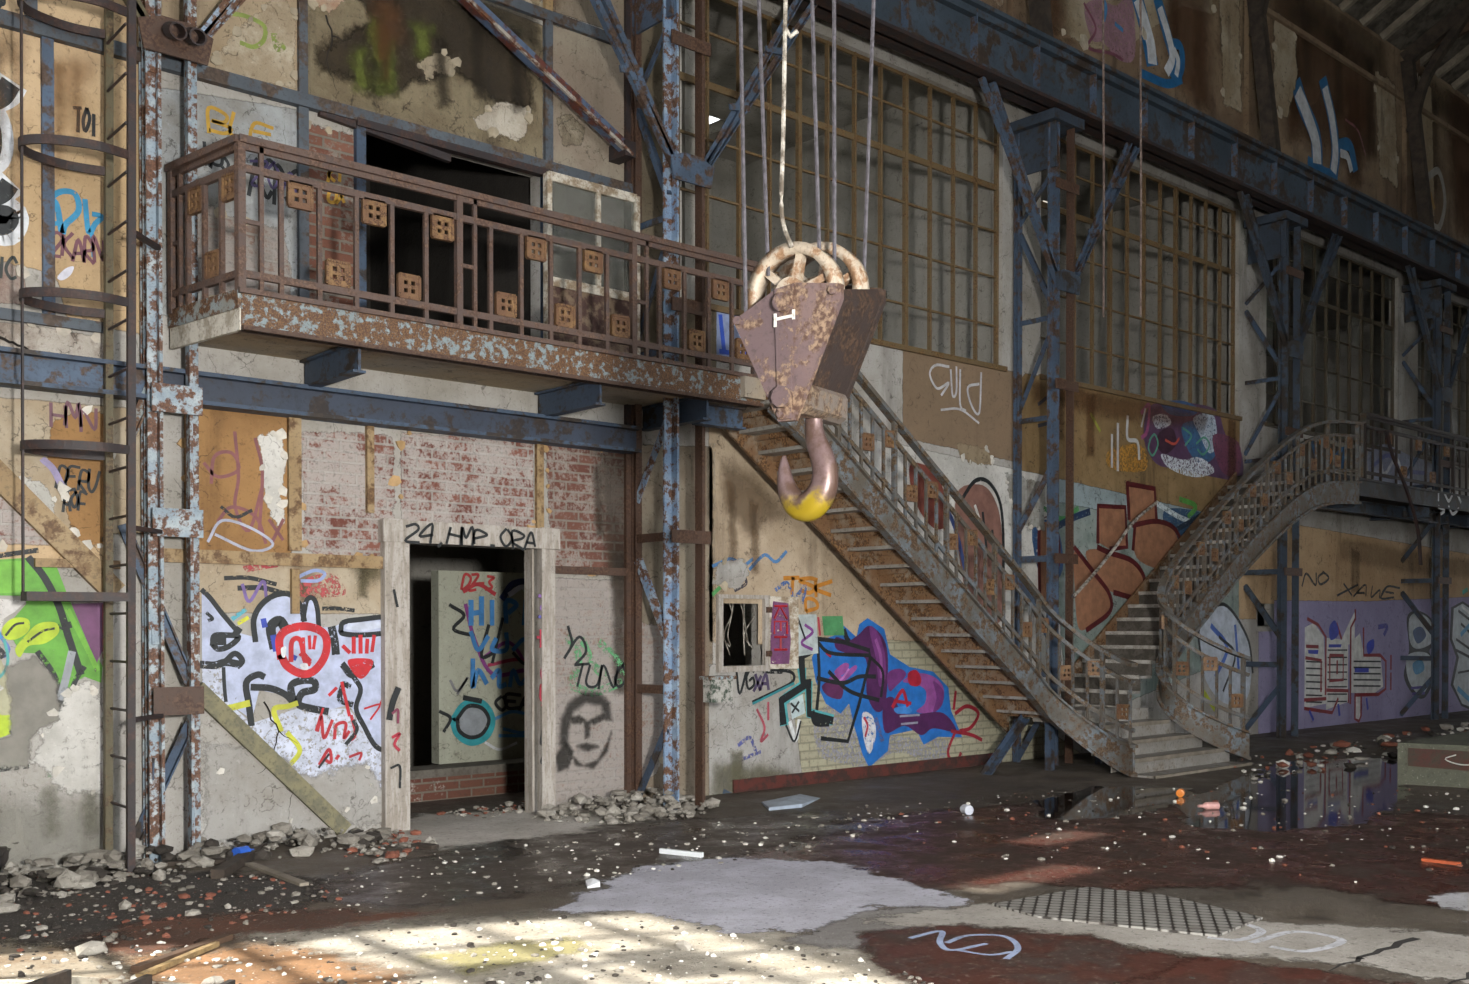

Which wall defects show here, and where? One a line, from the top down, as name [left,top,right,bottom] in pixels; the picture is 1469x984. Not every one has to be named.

water stain [316,0,538,108]
flaking render [473,101,533,142]
flaking render [176,409,624,577]
peeling [0,656,103,797]
crack [1329,937,1420,971]
crack [1448,972,1469,984]